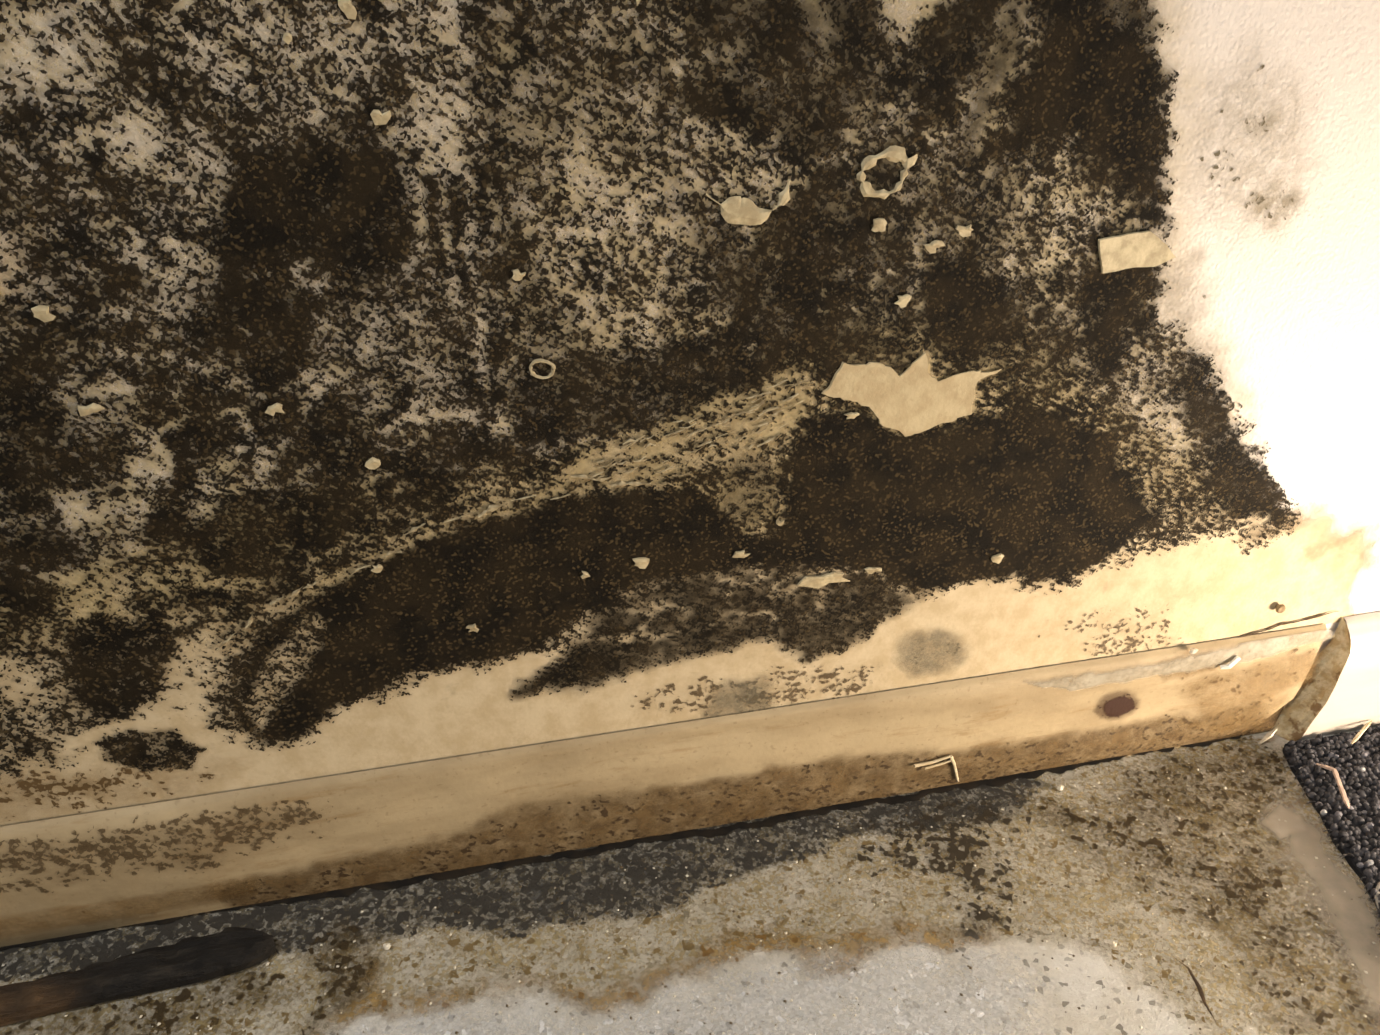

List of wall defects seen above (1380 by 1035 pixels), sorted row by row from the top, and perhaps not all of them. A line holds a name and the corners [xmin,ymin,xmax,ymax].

peeling [370,110,391,125]
peeling [706,179,790,225]
peeling [871,218,887,232]
peeling [923,224,974,254]
peeling [1098,230,1175,273]
peeling [31,305,56,323]
peeling [894,294,912,308]
leakage [0,0,1366,827]
spalling [571,352,1002,488]
peeling [633,557,650,569]
peeling [797,571,850,589]
leakage [0,735,1380,1035]